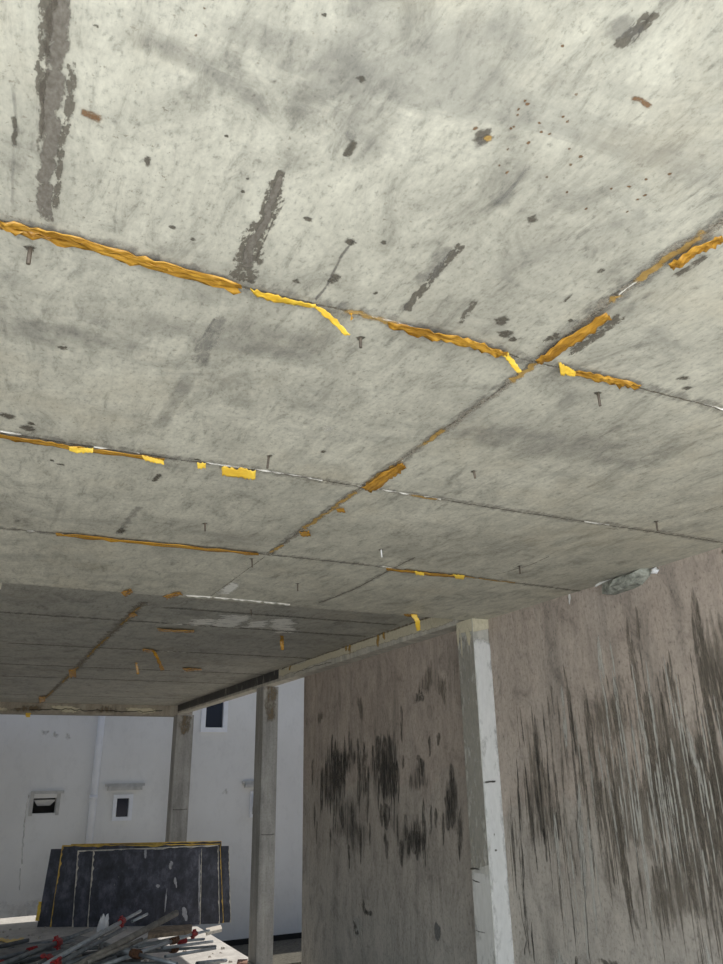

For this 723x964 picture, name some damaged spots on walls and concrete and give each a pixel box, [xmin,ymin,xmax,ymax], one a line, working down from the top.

corrosion [81,110,101,122]
leakage [265,687,277,721]
leakage [279,594,723,964]